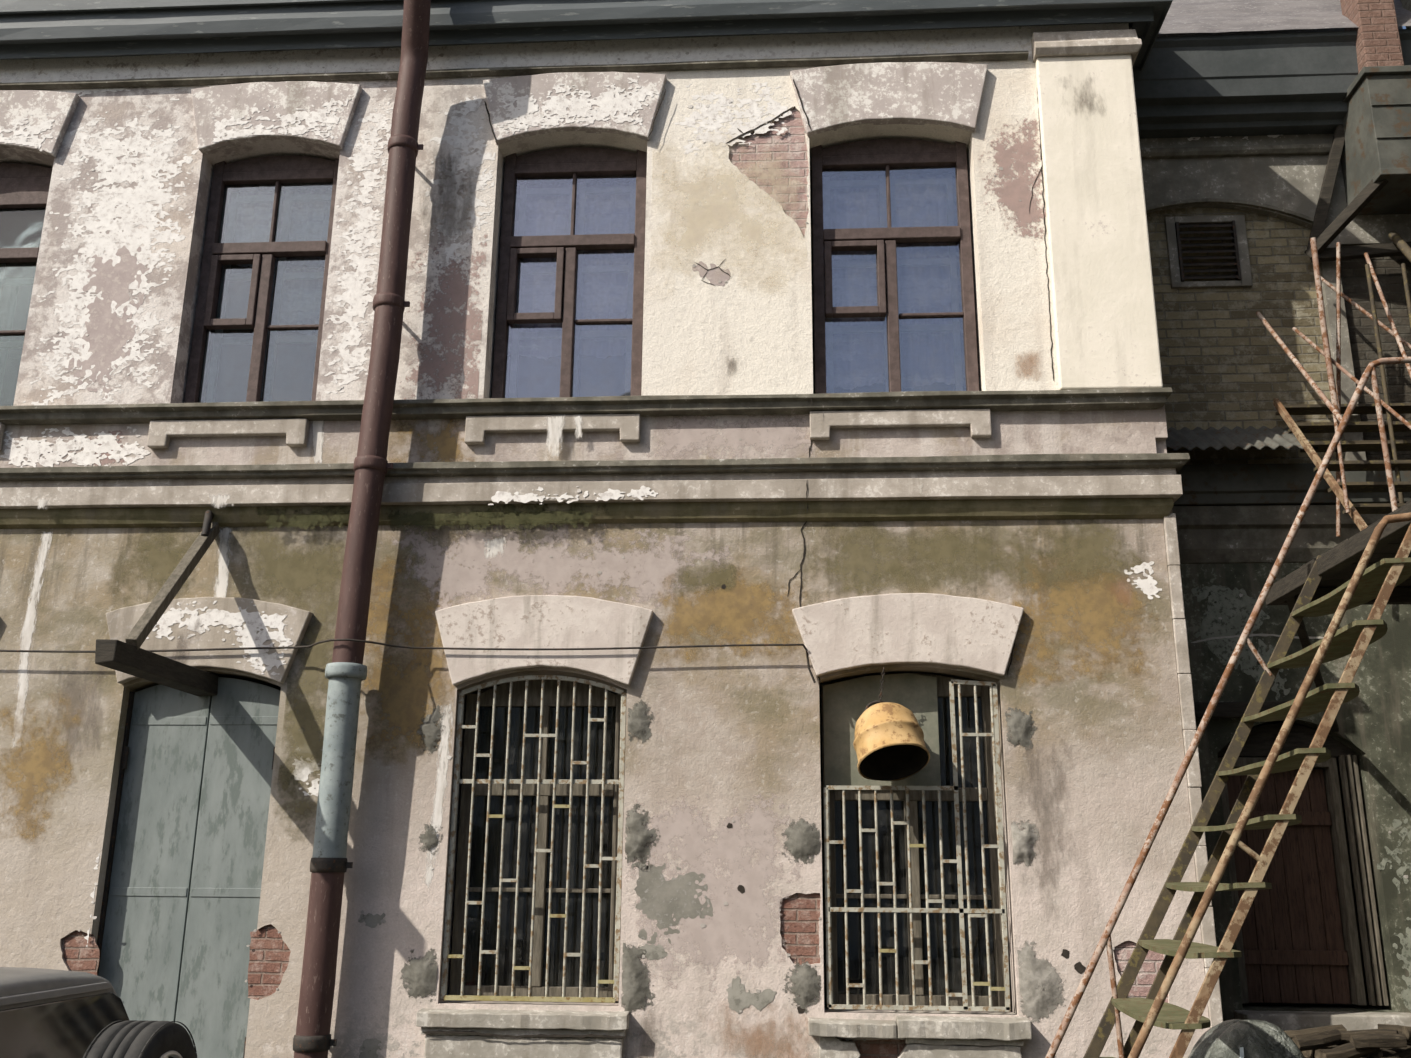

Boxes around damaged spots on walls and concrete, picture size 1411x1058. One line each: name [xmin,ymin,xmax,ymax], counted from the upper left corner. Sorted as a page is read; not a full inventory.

peeling [0,52,400,100]
peeling [0,90,393,405]
peeling [404,26,1032,400]
crack [1029,91,1054,381]
peeling [488,485,658,505]
damp [681,565,736,590]
crack [787,440,812,607]
damp [2,532,96,839]
spalling [62,854,100,975]
spalling [245,924,291,1000]
damp [627,857,716,945]
peeling [627,795,821,1014]